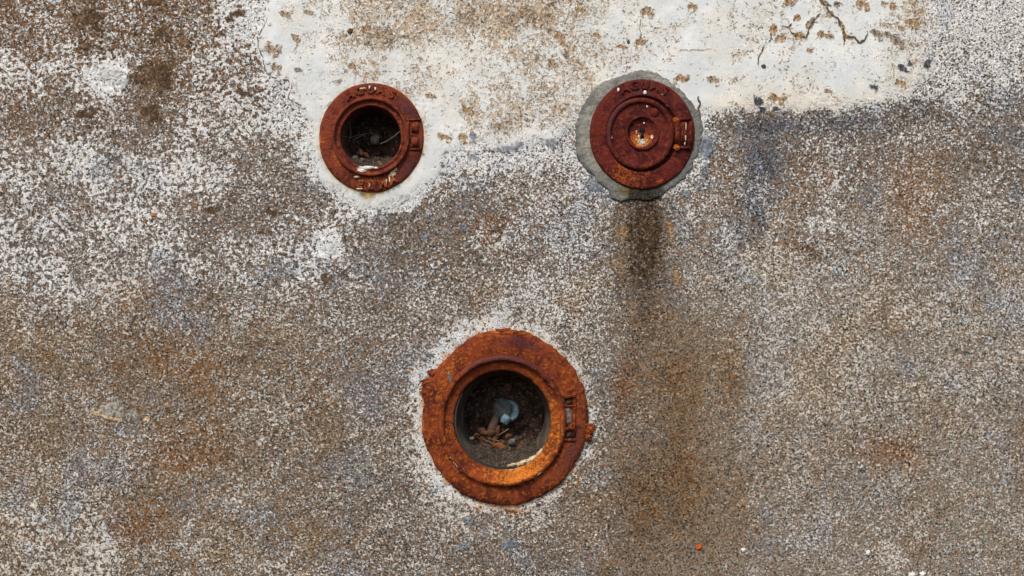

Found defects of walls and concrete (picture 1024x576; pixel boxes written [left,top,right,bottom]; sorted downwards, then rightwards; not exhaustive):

crack [758,0,868,64]
water stain [615,197,675,288]